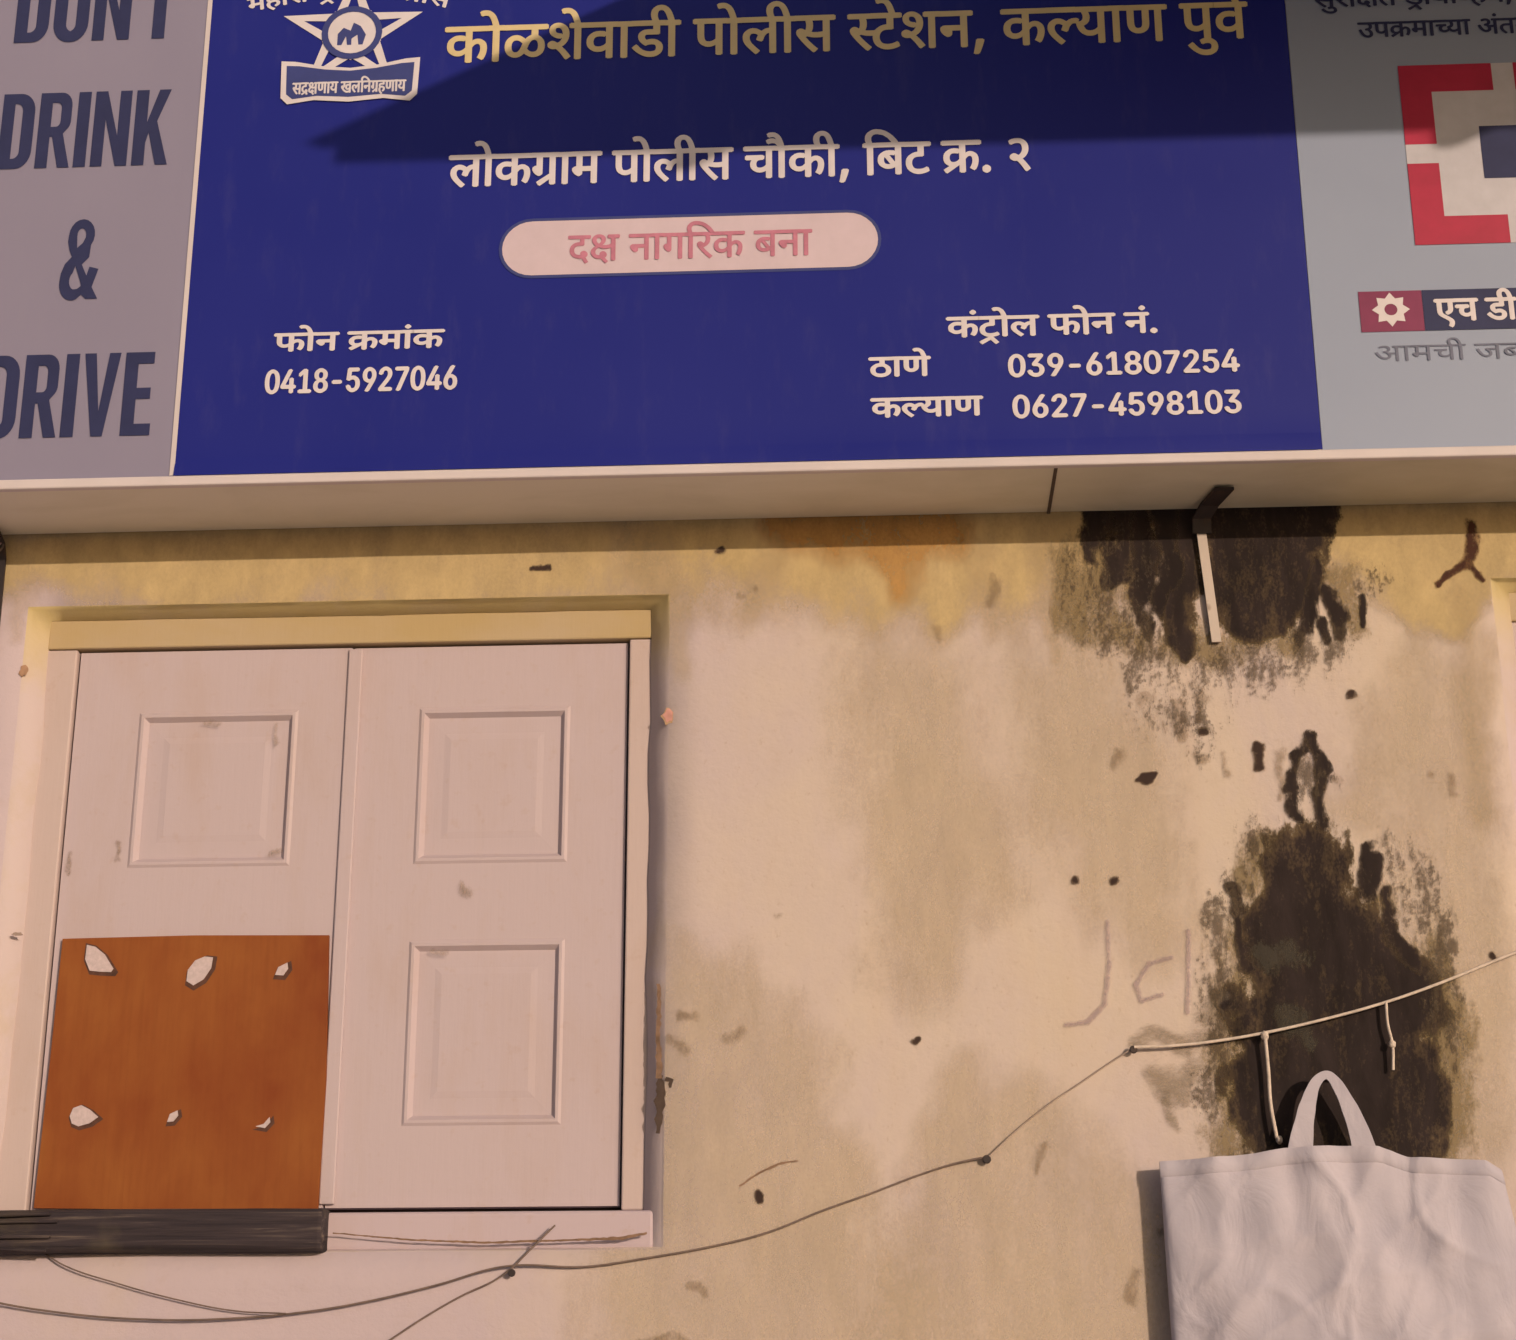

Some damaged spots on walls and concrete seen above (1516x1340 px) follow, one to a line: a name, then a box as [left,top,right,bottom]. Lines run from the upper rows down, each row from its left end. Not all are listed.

water stain [2,502,1516,771]
water stain [1192,730,1496,1159]
water stain [755,1189,764,1204]